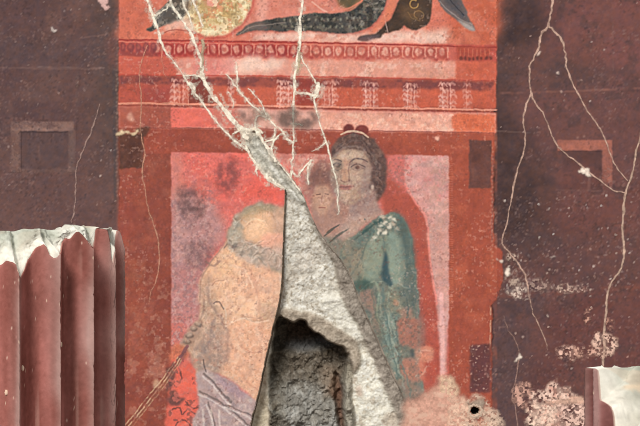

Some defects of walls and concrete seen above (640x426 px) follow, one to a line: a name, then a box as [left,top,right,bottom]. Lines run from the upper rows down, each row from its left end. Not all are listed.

crack [71,110,98,220]
crack [146,0,339,210]
spalling [245,130,503,426]
crack [502,0,640,367]
peeling [514,382,585,426]